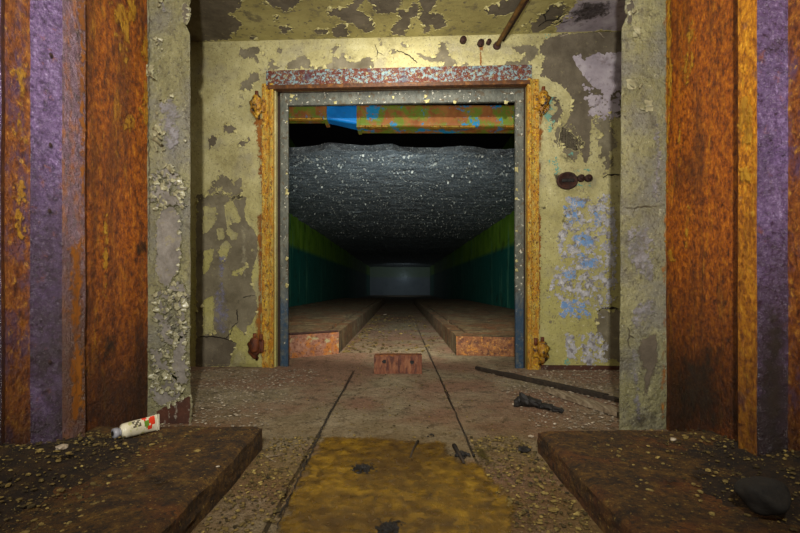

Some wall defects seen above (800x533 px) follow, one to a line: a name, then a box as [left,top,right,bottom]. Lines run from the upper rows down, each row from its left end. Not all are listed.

rust [13,68,26,97]
rust [12,180,27,243]
rust [67,239,85,425]
rust [77,0,87,195]
rust [109,0,136,67]
peeling [147,94,259,424]
peeling [181,0,244,42]
rust [254,118,262,194]
peeling [482,0,658,429]
rust [664,0,681,167]